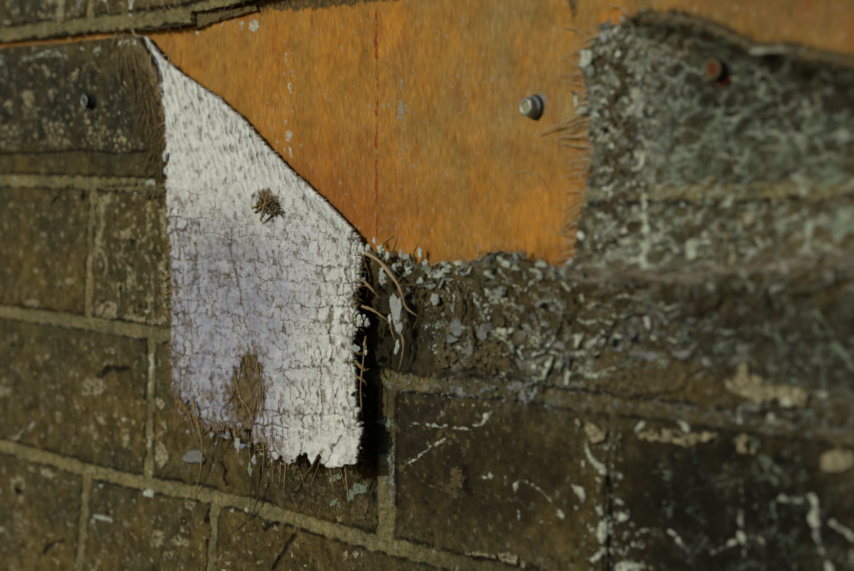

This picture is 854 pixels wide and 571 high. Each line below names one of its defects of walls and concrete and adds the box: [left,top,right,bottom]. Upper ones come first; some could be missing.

peeling [239,19,259,32]
spalling [372,18,854,571]
crack [99,366,130,379]
peeling [186,422,251,449]